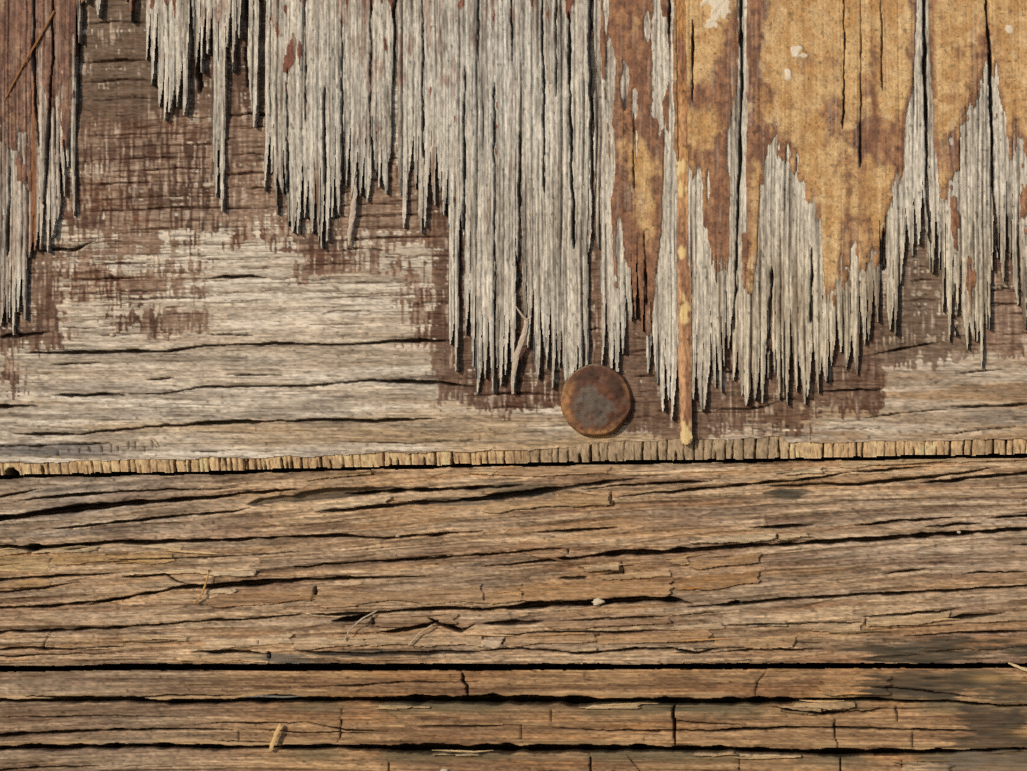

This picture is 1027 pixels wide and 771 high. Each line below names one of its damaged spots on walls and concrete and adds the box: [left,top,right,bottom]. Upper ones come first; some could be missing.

peeling [283,33,303,75]
peeling [0,0,80,193]
peeling [600,0,1027,337]
crack [42,242,90,252]
crack [213,272,266,280]
crack [0,332,449,355]
crack [875,343,932,355]
crack [0,379,474,408]
rust [560,379,617,437]
crack [825,386,877,394]
crack [16,417,433,436]
crack [0,472,1027,771]